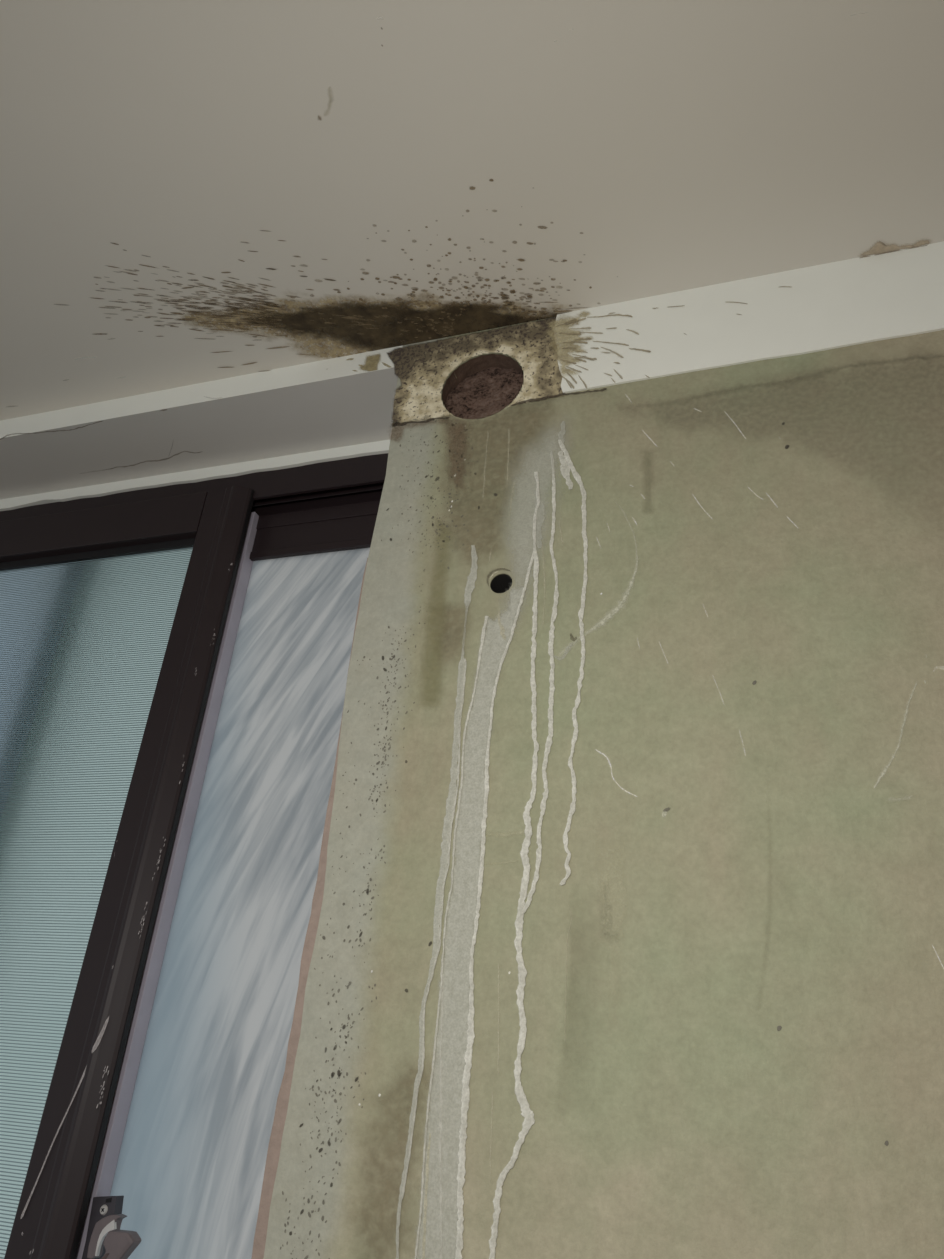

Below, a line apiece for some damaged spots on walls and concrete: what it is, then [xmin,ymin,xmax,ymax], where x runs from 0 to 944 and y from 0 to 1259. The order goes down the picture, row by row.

leakage [94,238,651,388]
peeling [860,241,929,258]
leakage [396,421,588,1259]